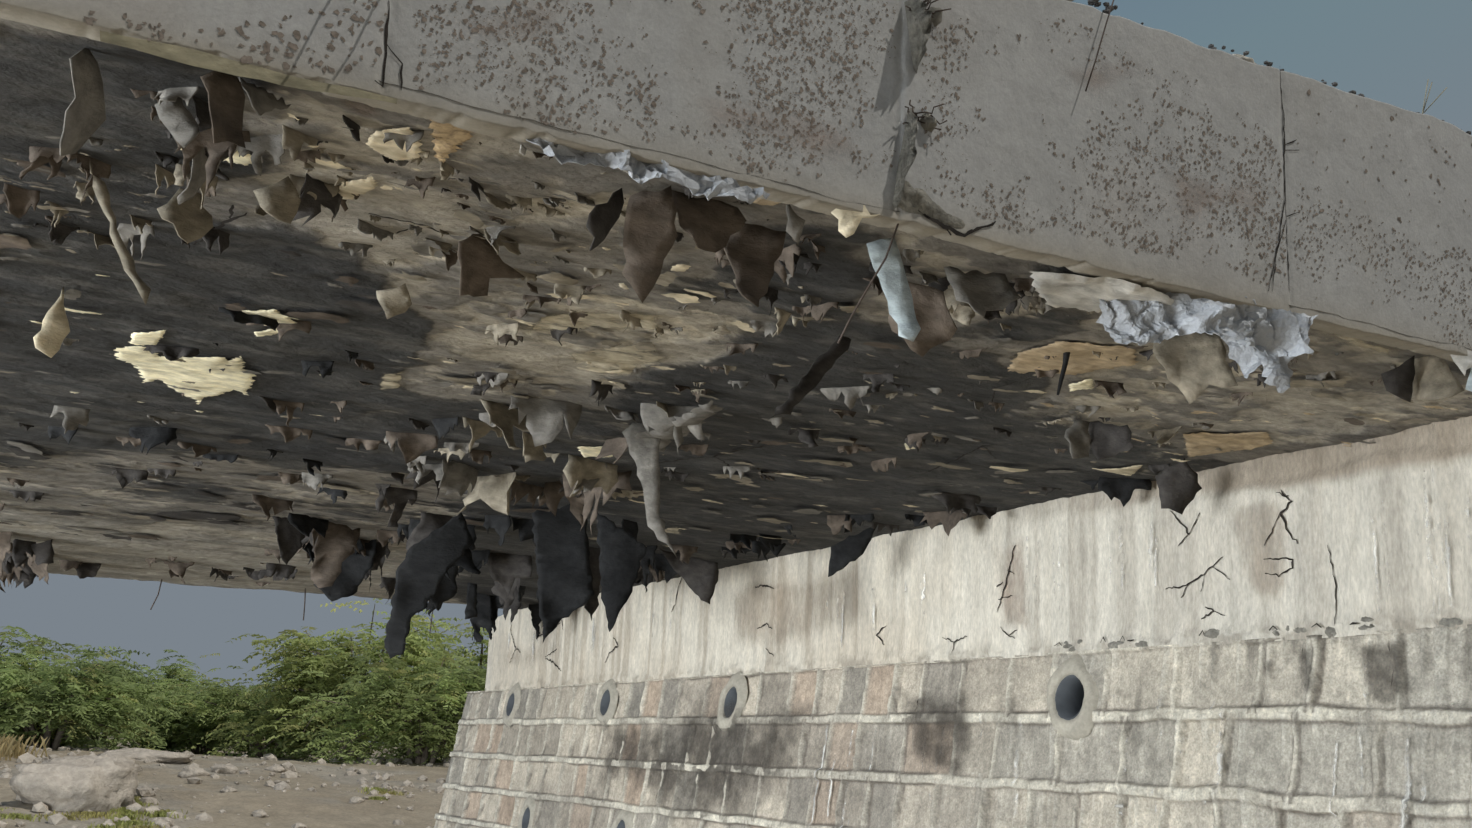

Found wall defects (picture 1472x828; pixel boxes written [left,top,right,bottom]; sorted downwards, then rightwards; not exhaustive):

peeling [0,0,1472,659]
crack [1171,511,1200,546]
crack [1166,557,1230,619]
crack [1263,490,1337,624]
leakage [607,721,787,805]
leakage [812,729,849,828]
leakage [908,699,980,773]